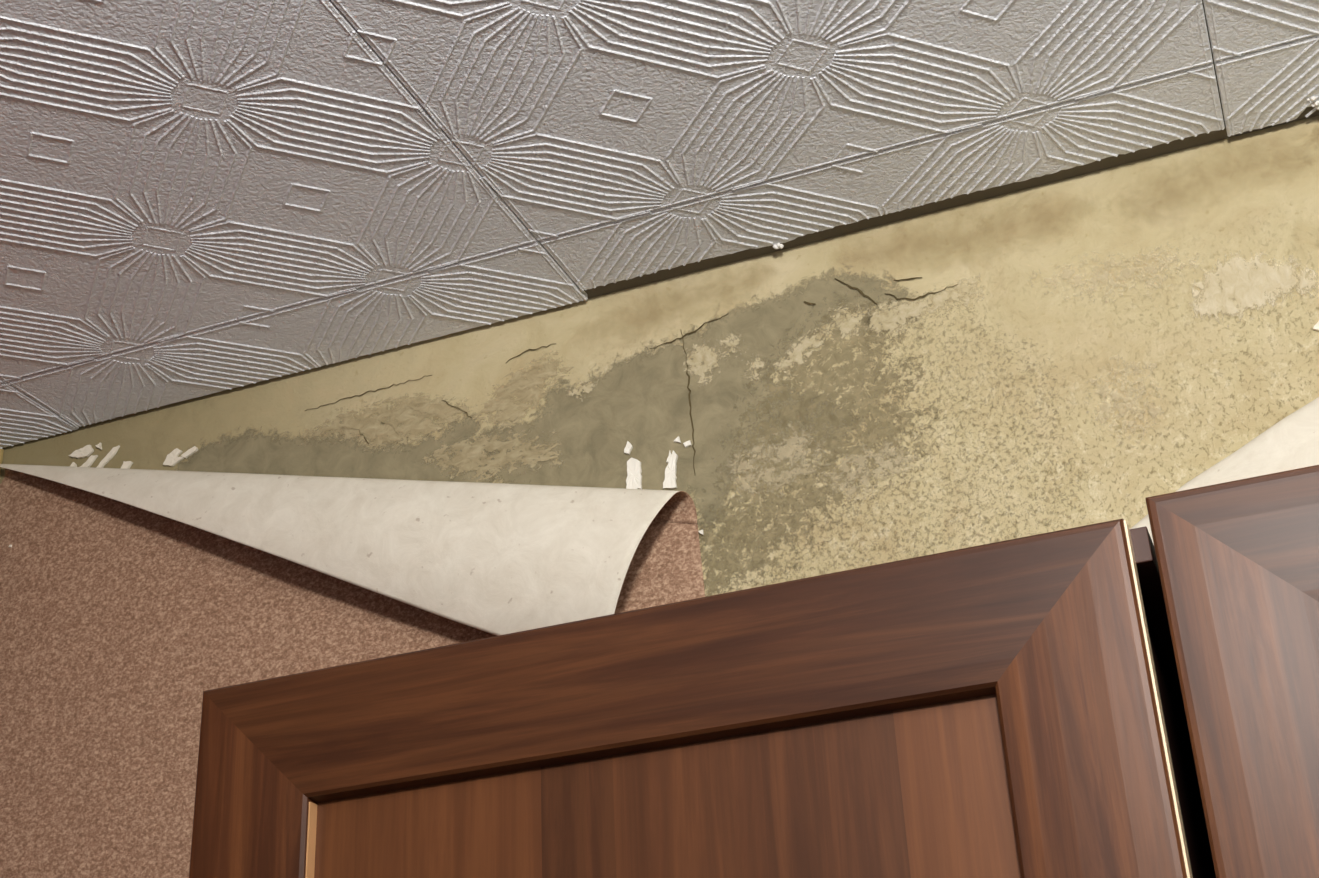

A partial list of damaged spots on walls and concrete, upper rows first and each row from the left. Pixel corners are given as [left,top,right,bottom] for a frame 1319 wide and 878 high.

flaking render [1191,253,1319,319]
peeling [68,443,133,469]
peeling [163,446,198,467]
flaking render [293,352,597,483]
damp [178,269,939,596]
crack [649,313,729,472]